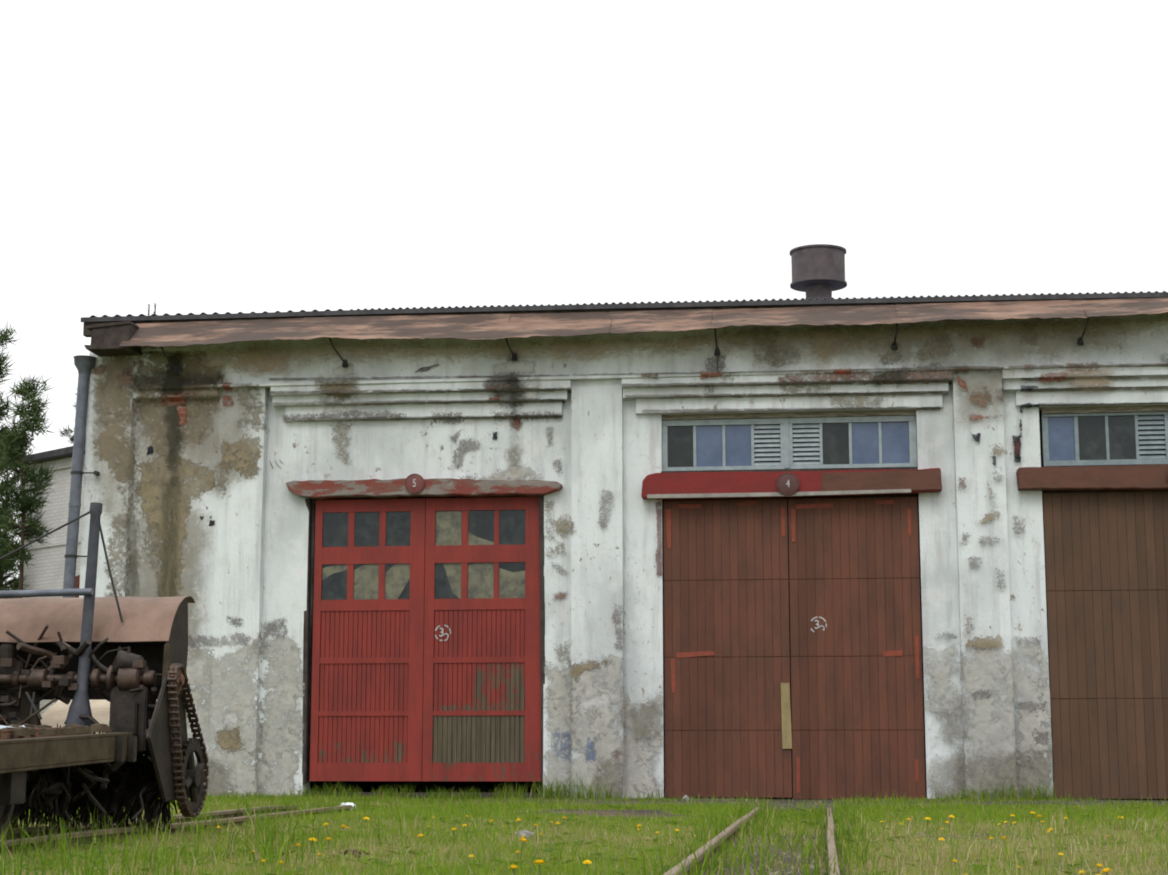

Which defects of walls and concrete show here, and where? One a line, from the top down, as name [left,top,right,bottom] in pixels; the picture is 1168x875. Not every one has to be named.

peeling [93,347,267,510]
leakage [105,349,675,597]
peeling [544,501,577,574]
peeling [598,490,613,528]
flaking render [185,617,305,797]
flaking render [543,605,664,798]
flaking render [923,615,1053,799]